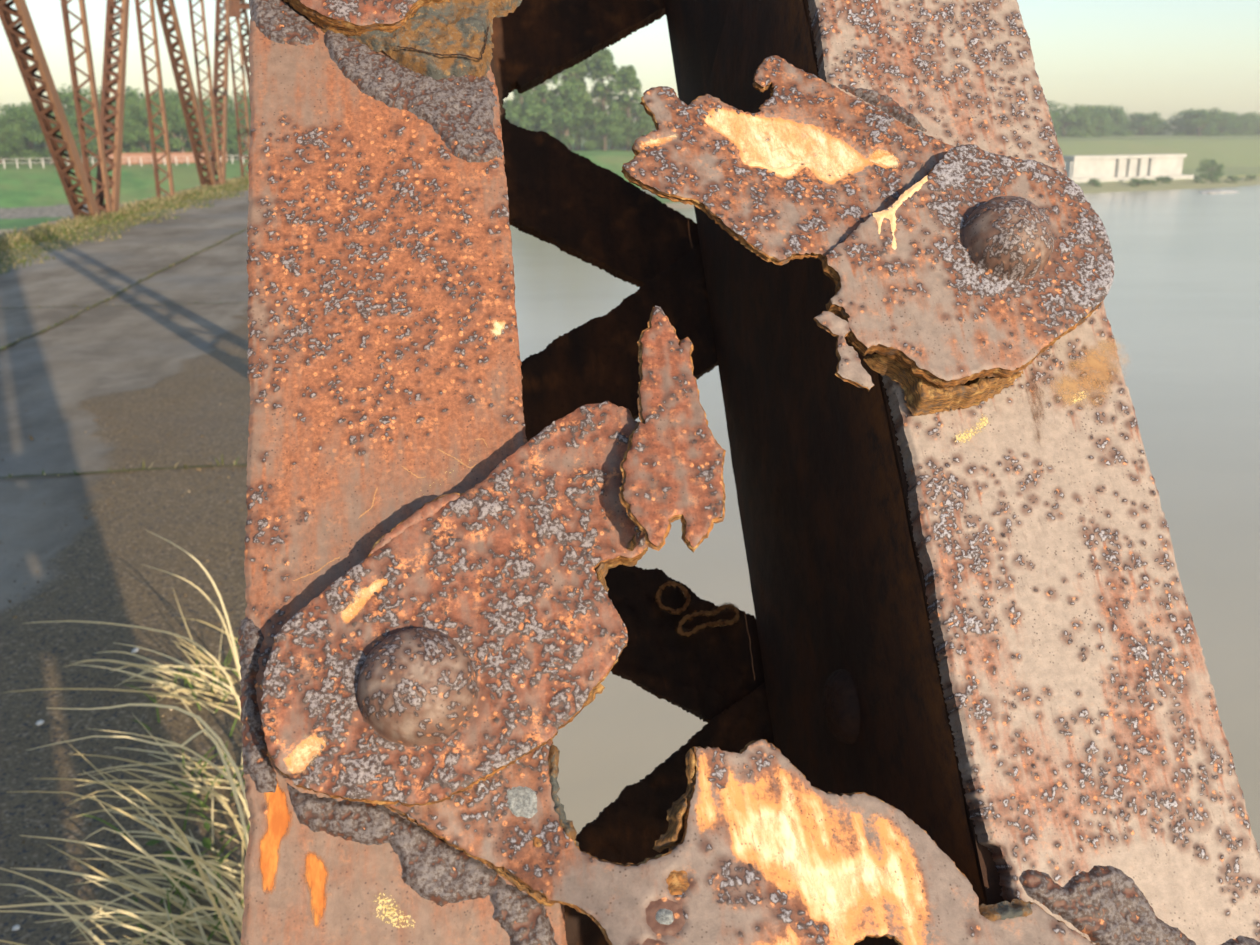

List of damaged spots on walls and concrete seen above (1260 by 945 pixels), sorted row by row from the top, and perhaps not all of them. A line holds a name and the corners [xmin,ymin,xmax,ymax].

corrosion [249,0,522,162]
peeling [716,112,853,171]
corrosion [838,84,927,132]
peeling [869,150,898,167]
peeling [492,321,505,336]
corrosion [813,311,1024,416]
corrosion [238,618,558,945]
spalling [507,786,538,818]
peeling [759,812,892,910]
hole [642,870,689,945]
corrosion [978,865,1196,945]
corrosion [1221,935,1260,945]